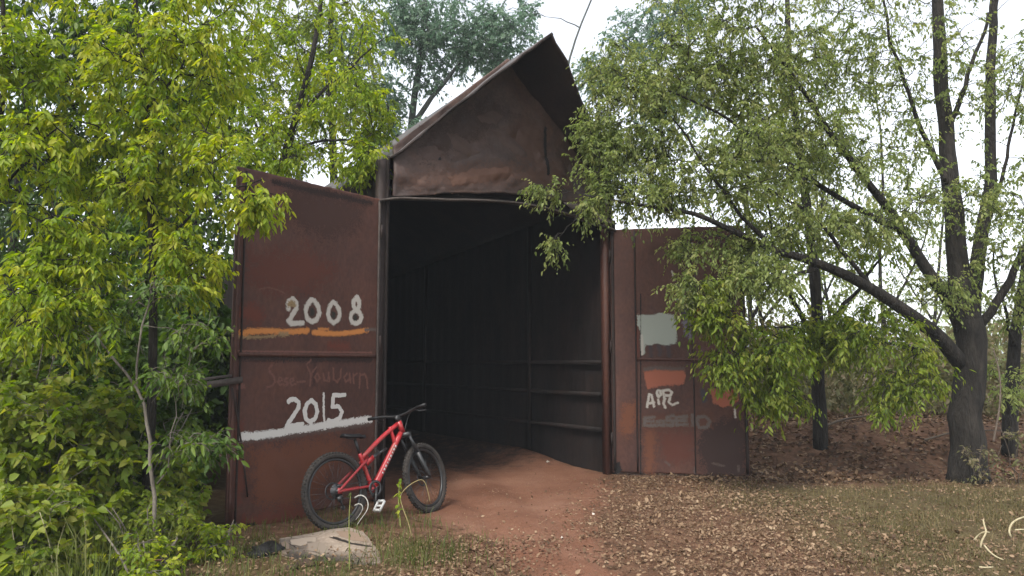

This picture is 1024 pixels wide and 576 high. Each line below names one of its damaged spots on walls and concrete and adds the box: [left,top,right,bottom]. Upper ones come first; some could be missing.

rust [394,157,576,197]
rust [616,399,660,476]